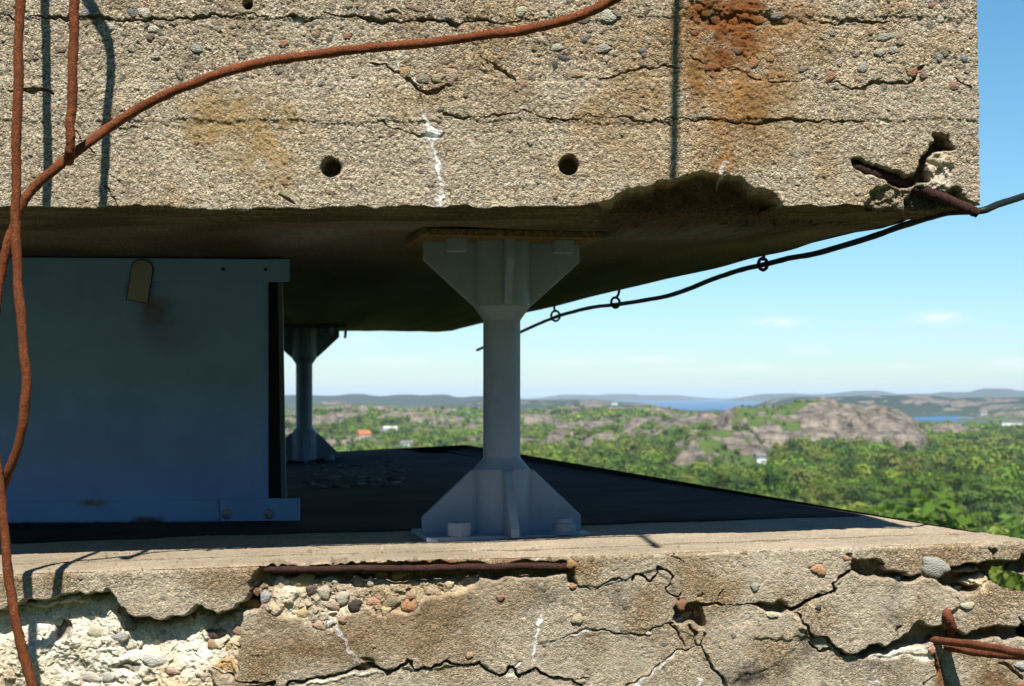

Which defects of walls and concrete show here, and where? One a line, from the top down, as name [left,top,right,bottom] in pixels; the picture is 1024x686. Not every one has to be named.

damp [191,101,288,162]
crack [0,8,530,30]
damp [421,108,445,207]
crack [369,55,865,139]
spalling [590,172,803,240]
corrosion [689,0,768,117]
crack [596,55,926,91]
spalling [851,133,980,218]
spalling [0,0,622,686]
crack [0,533,965,686]
spalling [850,558,920,583]
spalling [937,553,1024,594]